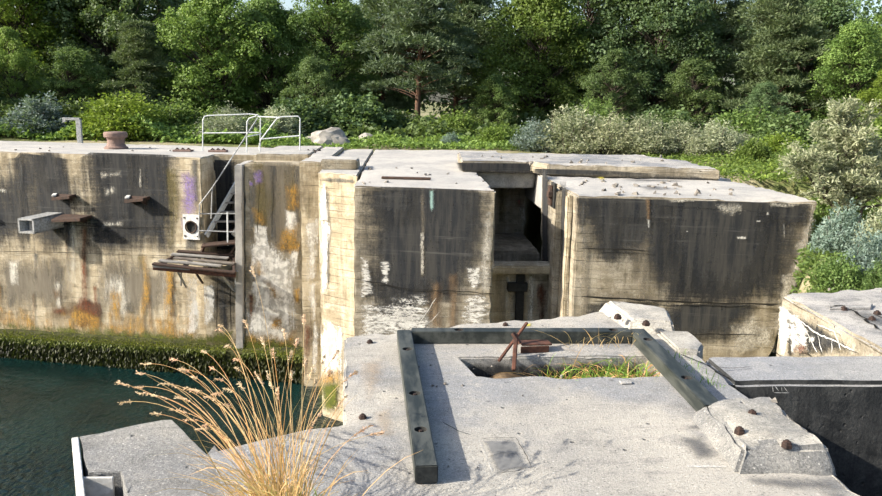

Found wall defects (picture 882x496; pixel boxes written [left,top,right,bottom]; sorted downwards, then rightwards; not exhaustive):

corrosion [53,226,121,328]
leakage [0,152,175,316]
corrosion [130,267,174,326]
peeling [247,226,299,342]
peeling [286,211,296,235]
leakage [359,186,504,331]
leakage [457,163,811,351]